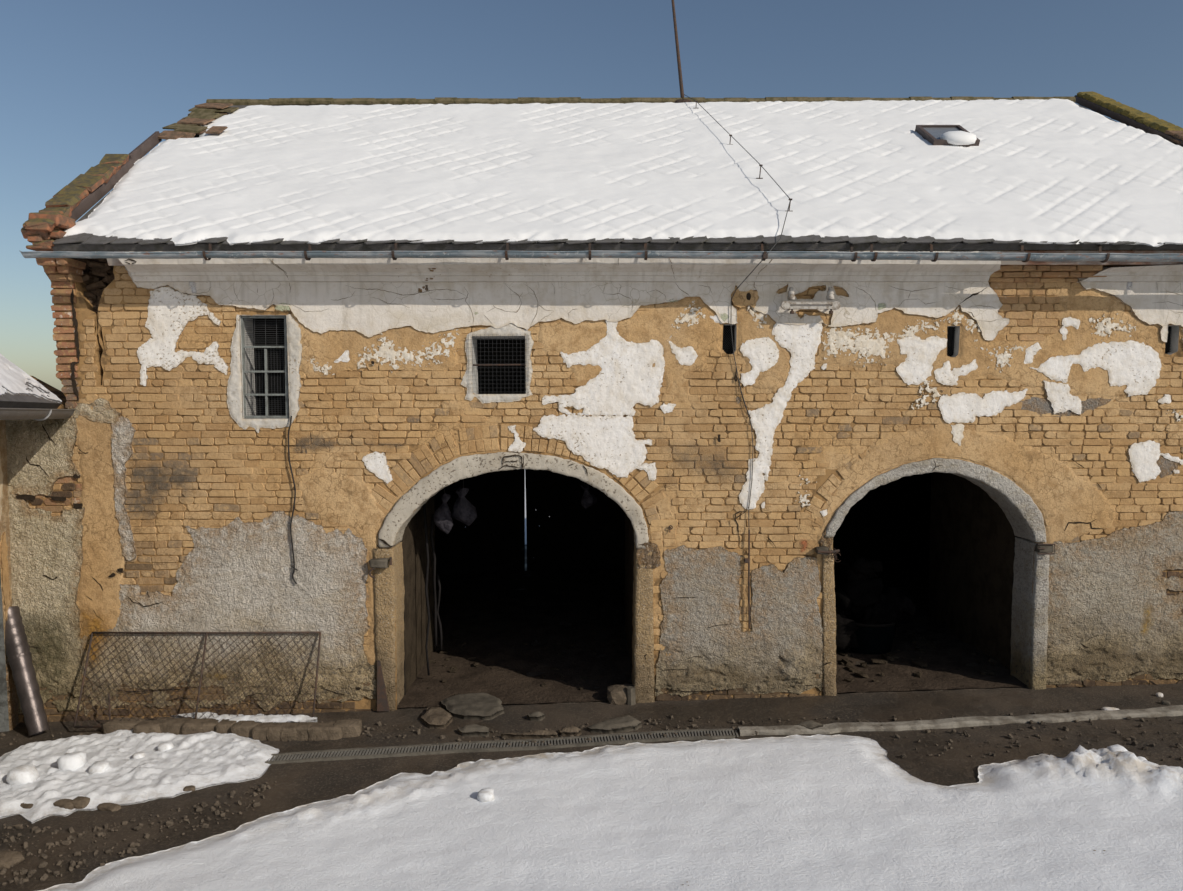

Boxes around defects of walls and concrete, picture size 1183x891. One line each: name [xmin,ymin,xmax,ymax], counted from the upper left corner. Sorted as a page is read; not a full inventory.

crack [70,251,136,402]
peeling [137,287,229,386]
crack [157,259,575,327]
peeling [304,329,459,375]
crack [858,286,999,322]
peeling [533,300,722,481]
peeling [731,282,1183,509]
peeling [68,398,186,592]
peeling [362,451,393,484]
peeling [508,425,526,452]
spalling [795,472,834,547]
spalling [636,542,661,569]